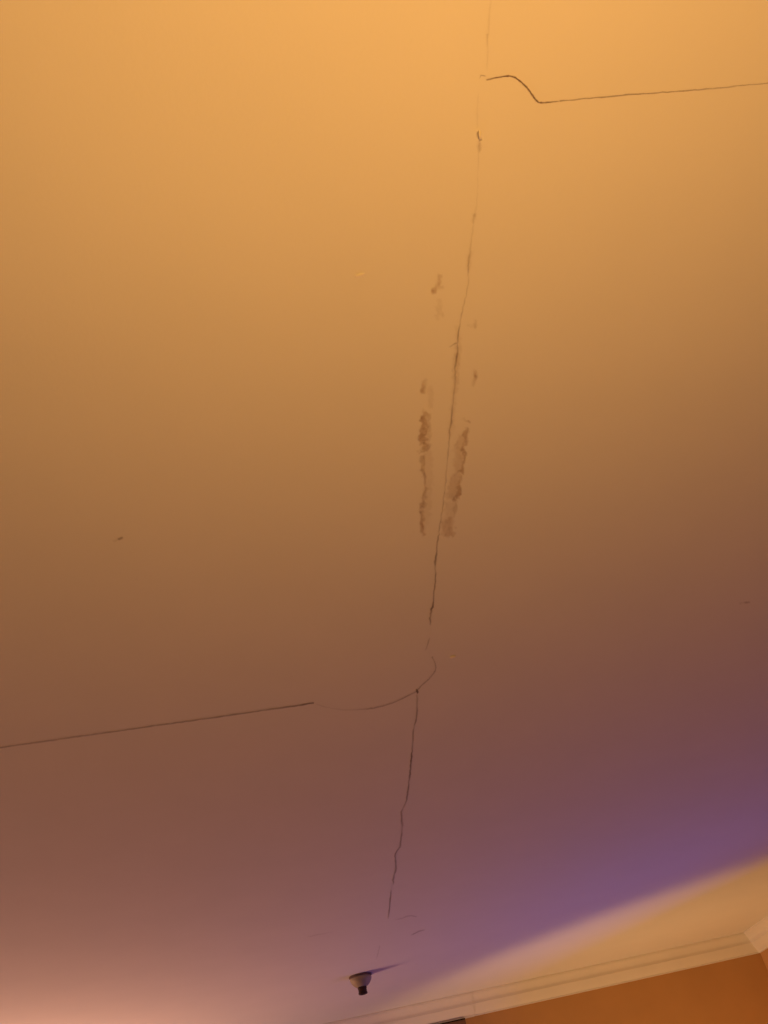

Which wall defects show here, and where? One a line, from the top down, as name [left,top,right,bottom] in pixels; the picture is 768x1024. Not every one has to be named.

crack [488,75,557,103]